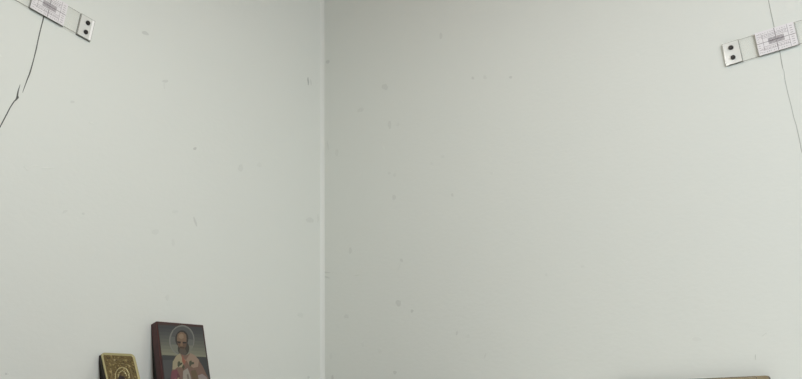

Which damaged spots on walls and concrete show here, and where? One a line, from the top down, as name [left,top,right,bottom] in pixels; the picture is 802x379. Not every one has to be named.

crack [0,16,44,127]
crack [779,51,802,152]